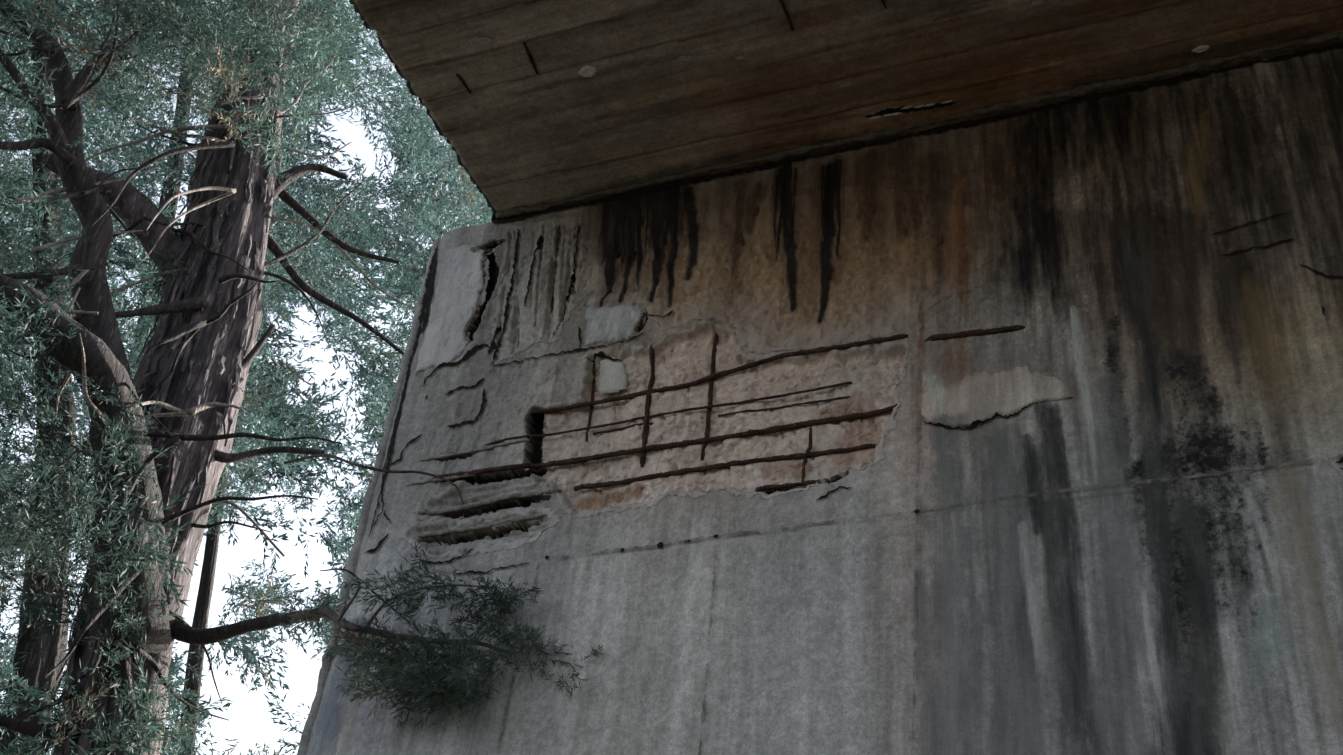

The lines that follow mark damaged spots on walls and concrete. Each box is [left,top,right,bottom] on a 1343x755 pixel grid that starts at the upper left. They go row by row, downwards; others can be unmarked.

water stain [589,152,769,307]
spalling [401,183,1012,558]
water stain [731,162,797,311]
crack [365,42,1343,553]
rust [925,325,1025,342]
water stain [915,210,1311,755]